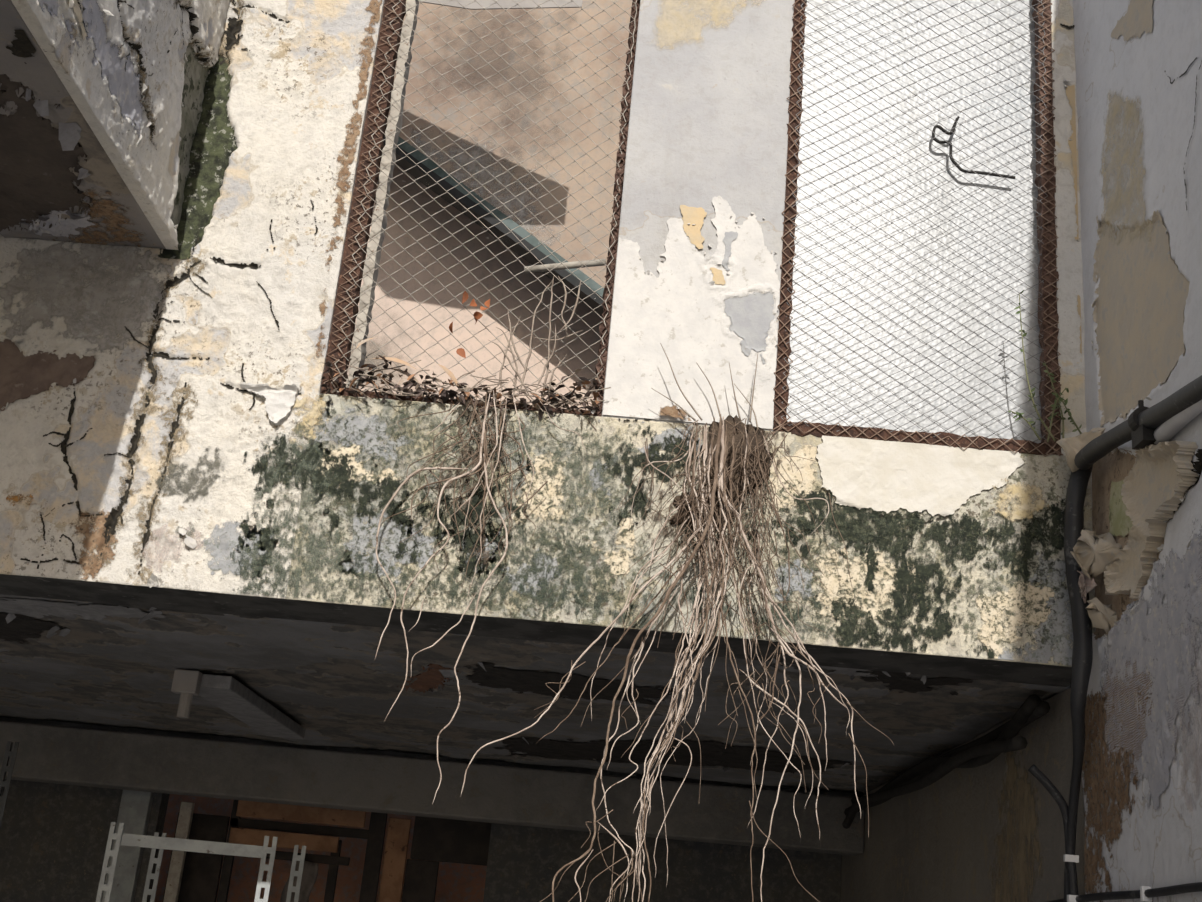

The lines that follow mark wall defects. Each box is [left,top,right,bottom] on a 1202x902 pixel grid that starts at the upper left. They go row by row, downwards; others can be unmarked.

spalling [6,30,36,64]
peeling [38,0,152,146]
crack [117,0,290,151]
corrosion [316,0,382,357]
peeling [1063,79,1080,242]
spalling [0,339,96,411]
crack [20,219,280,582]
peeling [240,382,299,426]
peeling [591,196,780,461]
peeling [763,436,1024,517]
peeling [971,210,1202,810]